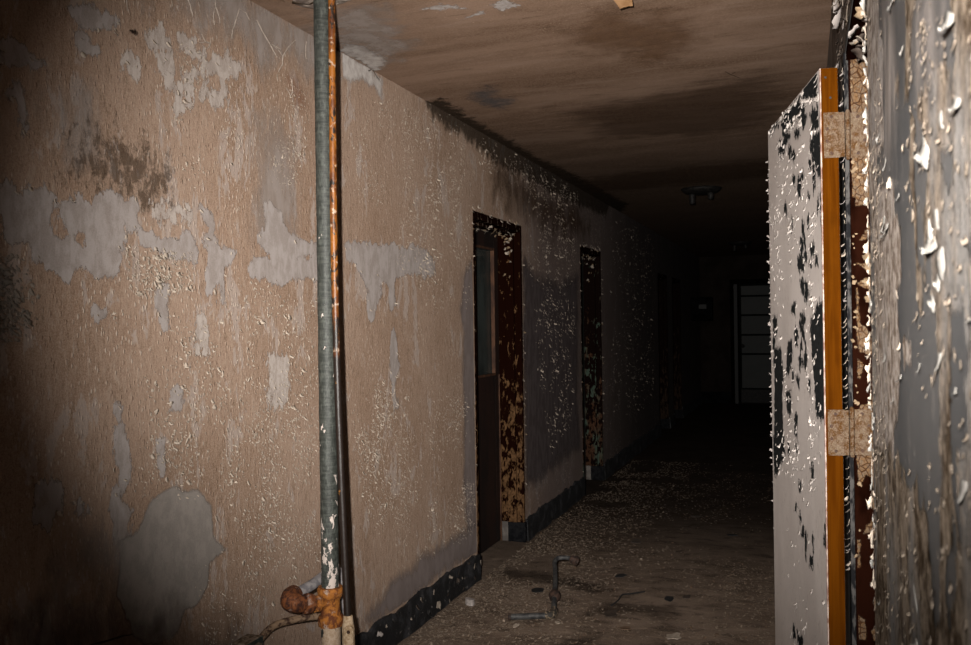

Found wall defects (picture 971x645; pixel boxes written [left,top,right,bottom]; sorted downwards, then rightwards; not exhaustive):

peeling [119,49,142,84]
peeling [0,74,321,645]
peeling [130,21,254,167]
peeling [344,94,654,454]
spalling [614,0,633,9]
peeling [766,75,826,578]
peeling [831,0,971,645]
peeling [790,588,818,645]